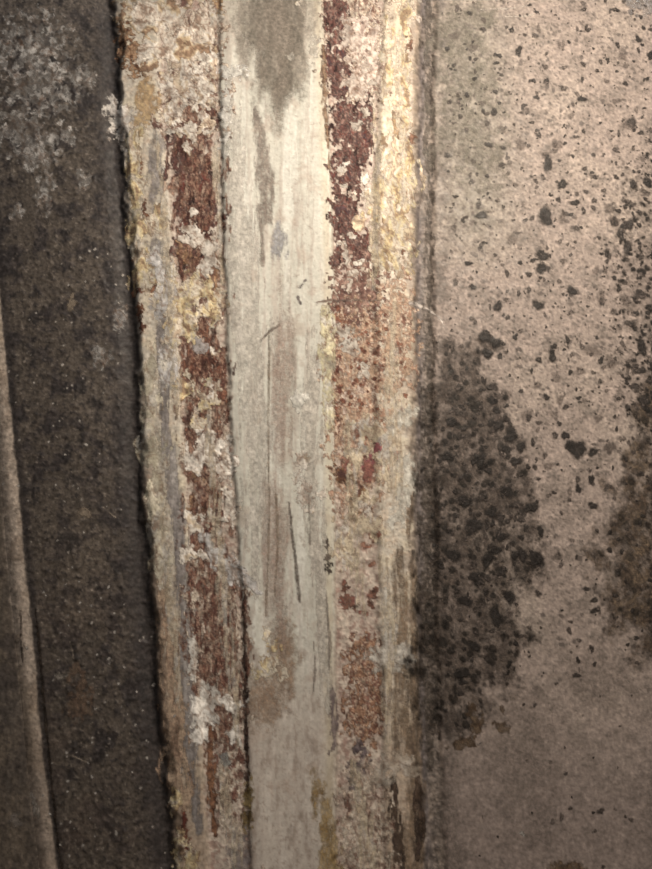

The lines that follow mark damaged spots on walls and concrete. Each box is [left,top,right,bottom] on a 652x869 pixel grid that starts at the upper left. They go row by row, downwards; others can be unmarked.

peeling [102,0,263,595]
rust [112,0,302,869]
peeling [187,635,249,747]
water stain [212,0,320,600]
rust [323,538,333,574]
peeling [317,305,370,429]
rust [339,580,378,617]
rust [312,0,424,529]
peeling [343,413,398,493]
water stain [372,109,386,290]
water stain [379,0,545,869]
water stain [586,150,652,662]